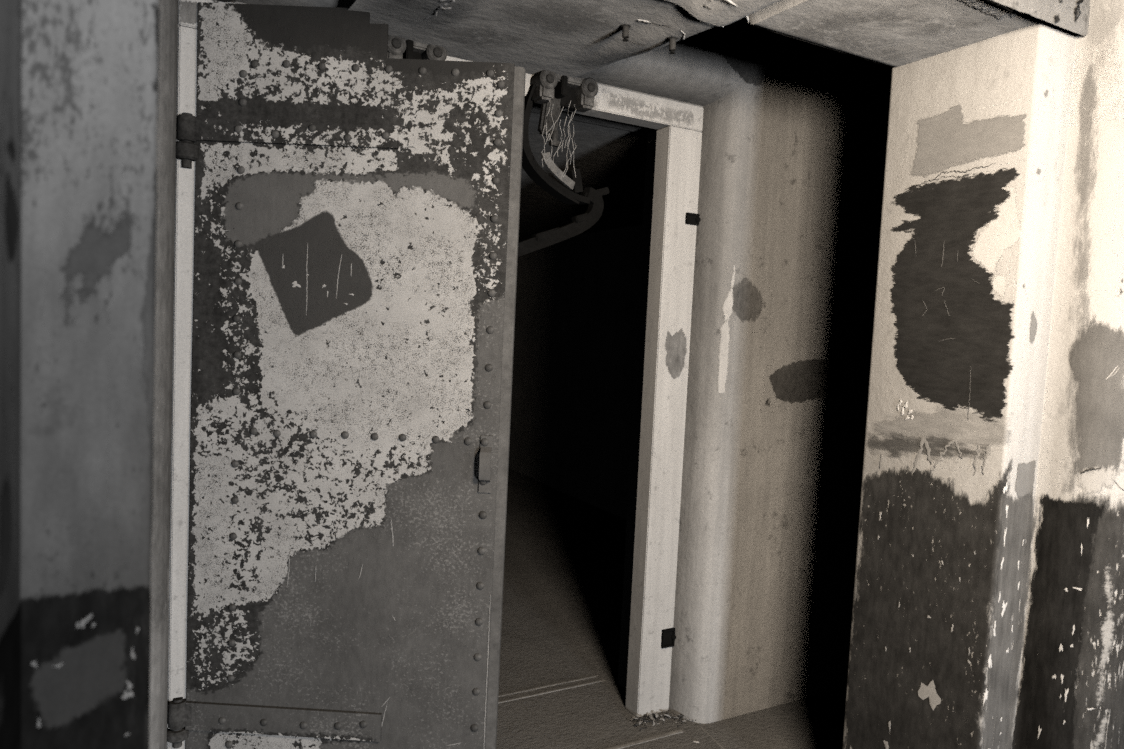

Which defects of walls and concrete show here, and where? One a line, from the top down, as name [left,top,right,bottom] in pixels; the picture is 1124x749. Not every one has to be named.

peeling [0,0,178,749]
peeling [972,185,1022,298]
peeling [842,462,1124,749]